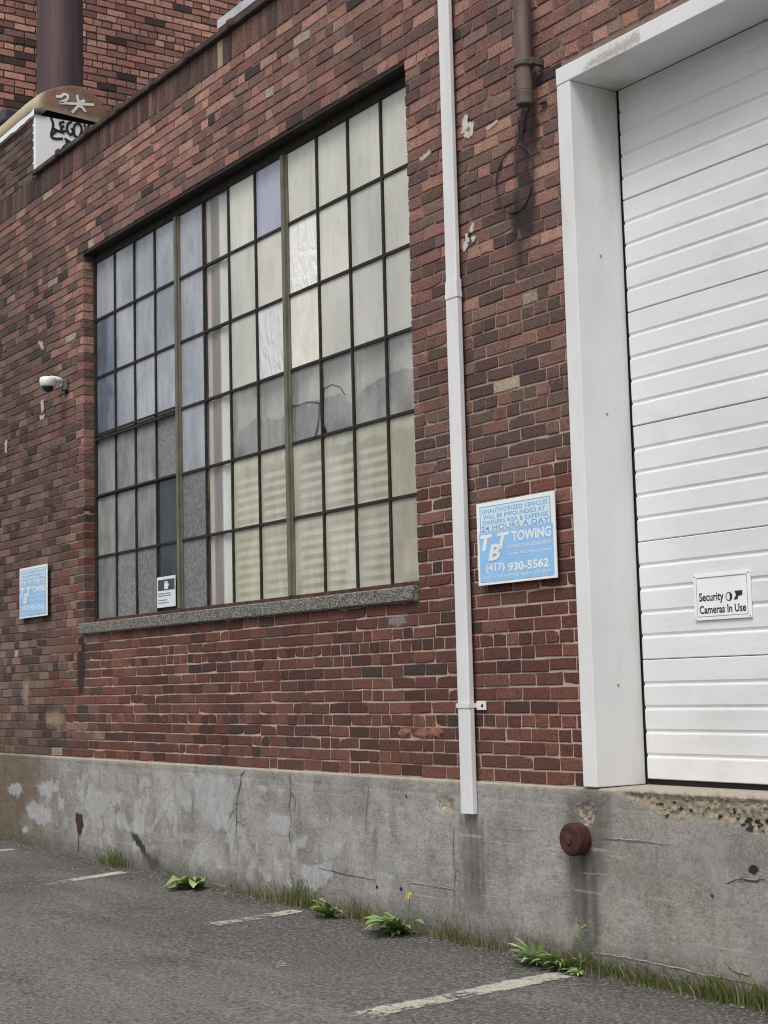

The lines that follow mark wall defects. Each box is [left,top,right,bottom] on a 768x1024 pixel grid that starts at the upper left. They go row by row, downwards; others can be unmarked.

peeling [461,114,498,138]
peeling [462,223,476,251]
crack [230,771,245,846]
crack [288,773,296,849]
spalling [623,791,768,836]
rust [75,813,84,854]
water stain [130,832,158,866]
crack [603,836,671,846]
crack [726,876,766,884]